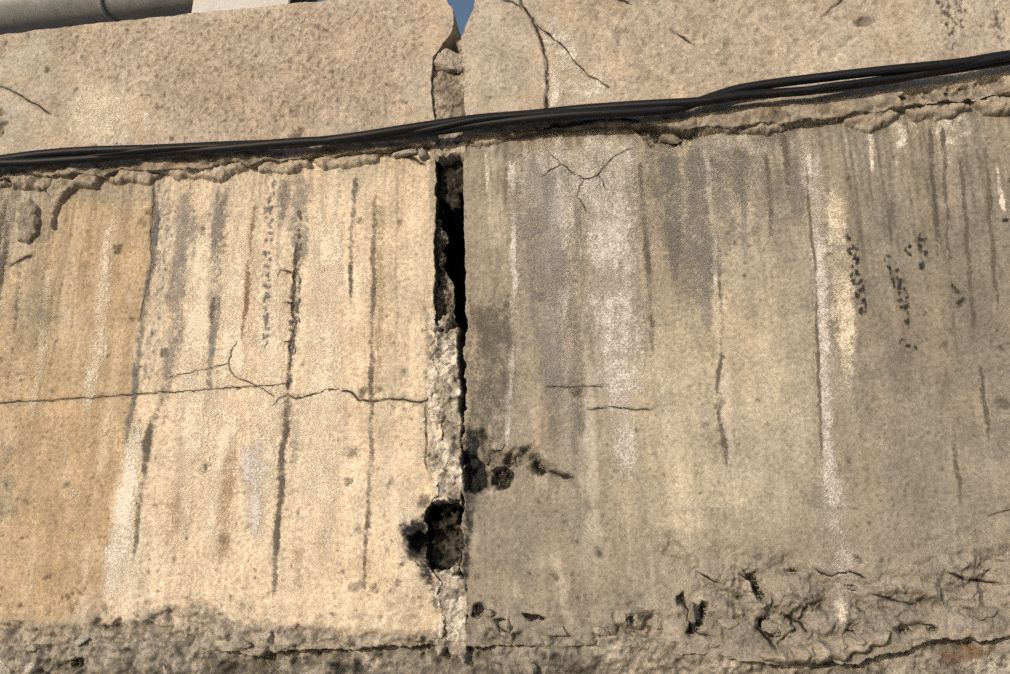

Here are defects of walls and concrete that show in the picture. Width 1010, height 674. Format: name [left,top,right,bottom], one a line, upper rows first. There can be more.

crack [502,0,639,211]
damp [892,115,975,325]
damp [104,172,358,600]
crack [167,211,436,469]
spalling [426,304,442,439]
damp [461,128,867,578]
spalling [462,431,573,494]
spalling [0,579,445,674]
damp [399,513,438,589]
spalling [465,519,1010,665]
crack [814,568,933,626]
crack [948,572,999,583]